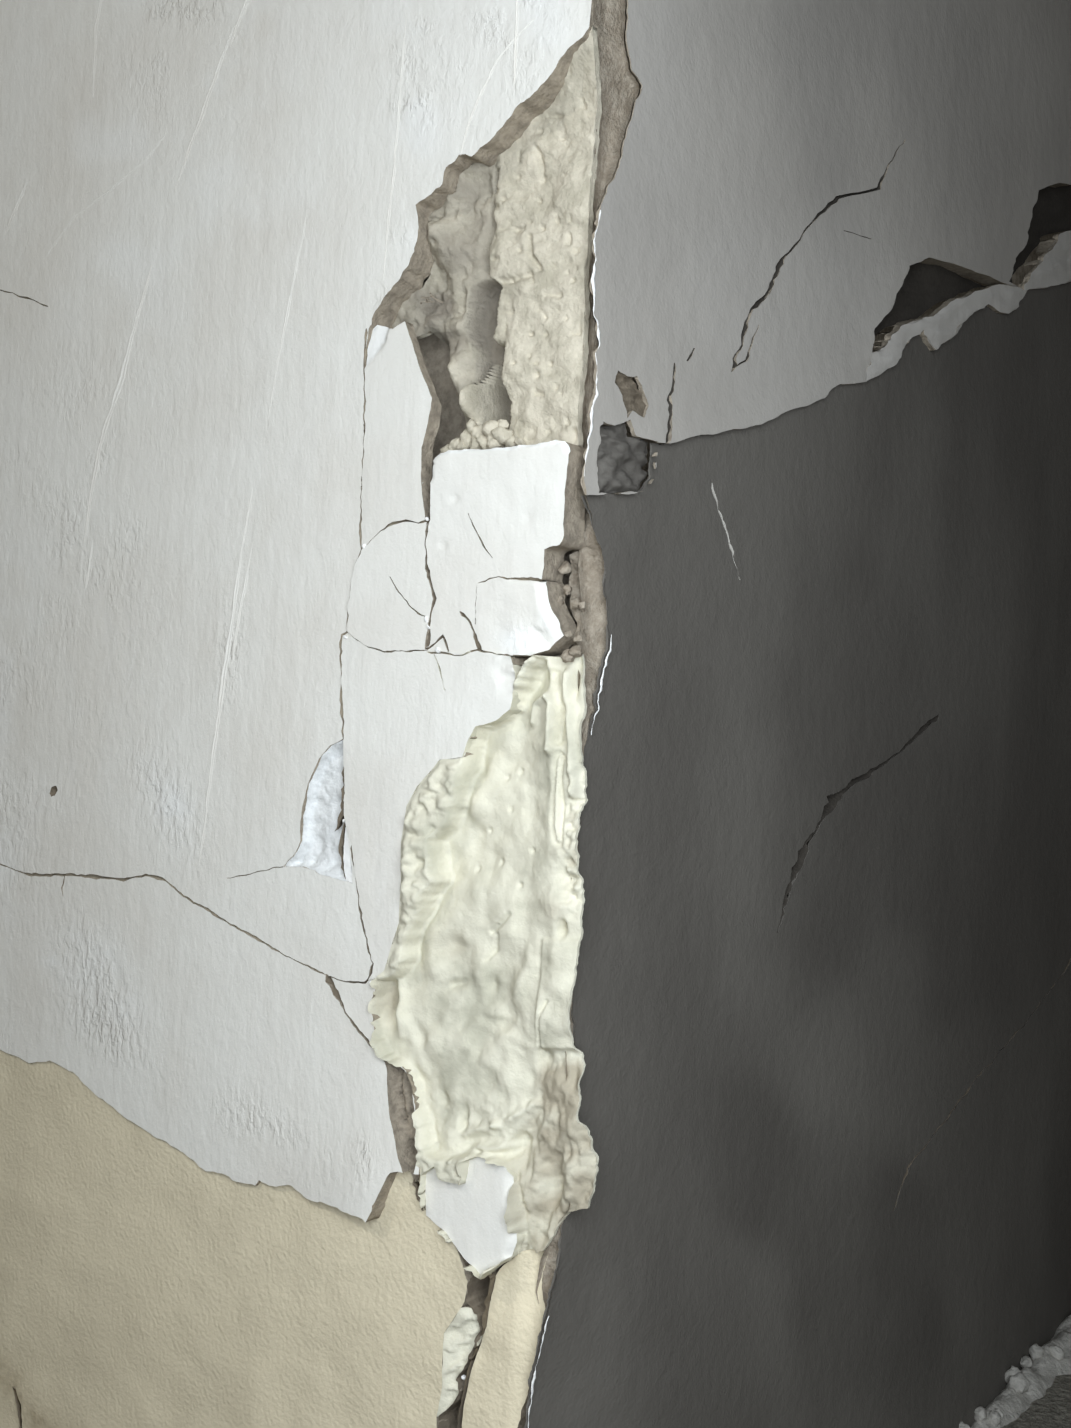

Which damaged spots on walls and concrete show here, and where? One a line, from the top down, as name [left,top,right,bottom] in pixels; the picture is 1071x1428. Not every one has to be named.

crack [0,290,48,307]
crack [359,330,430,556]
spalling [347,0,640,651]
crack [663,348,695,444]
crack [732,148,898,368]
crack [0,544,543,1211]
peeling [0,508,607,1428]
peeling [524,185,1071,1428]
crack [777,715,938,933]
crack [437,1258,513,1428]